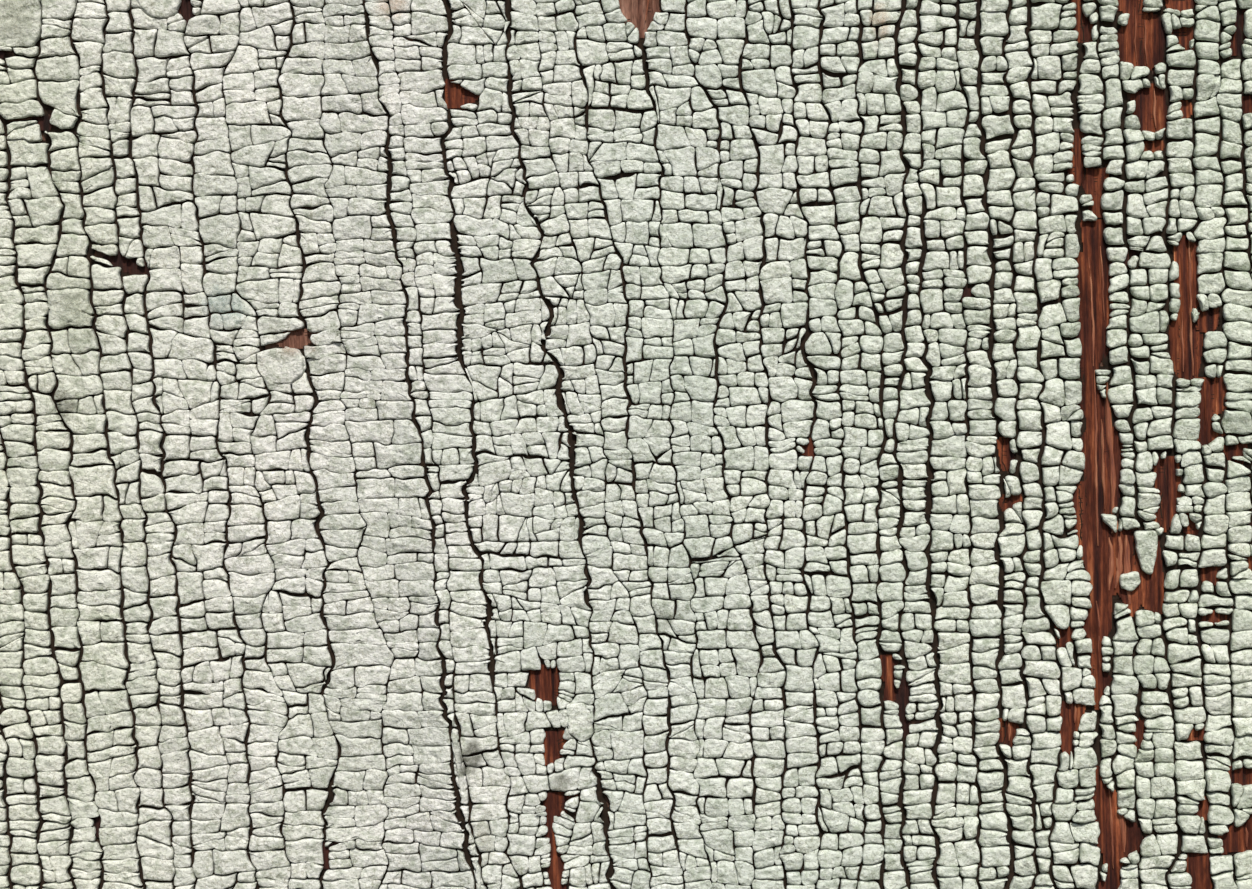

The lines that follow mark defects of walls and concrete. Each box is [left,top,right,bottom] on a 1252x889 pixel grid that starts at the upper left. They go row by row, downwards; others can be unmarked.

peeling [436,64,485,111]
peeling [91,237,183,294]
peeling [257,311,346,384]
peeling [968,0,1252,889]
crack [1062,571,1092,630]
crack [339,641,424,797]
peeling [856,653,938,747]
crack [95,837,113,889]
crack [132,754,177,889]
crack [273,729,356,843]
crack [336,804,431,889]
peeling [534,790,590,889]